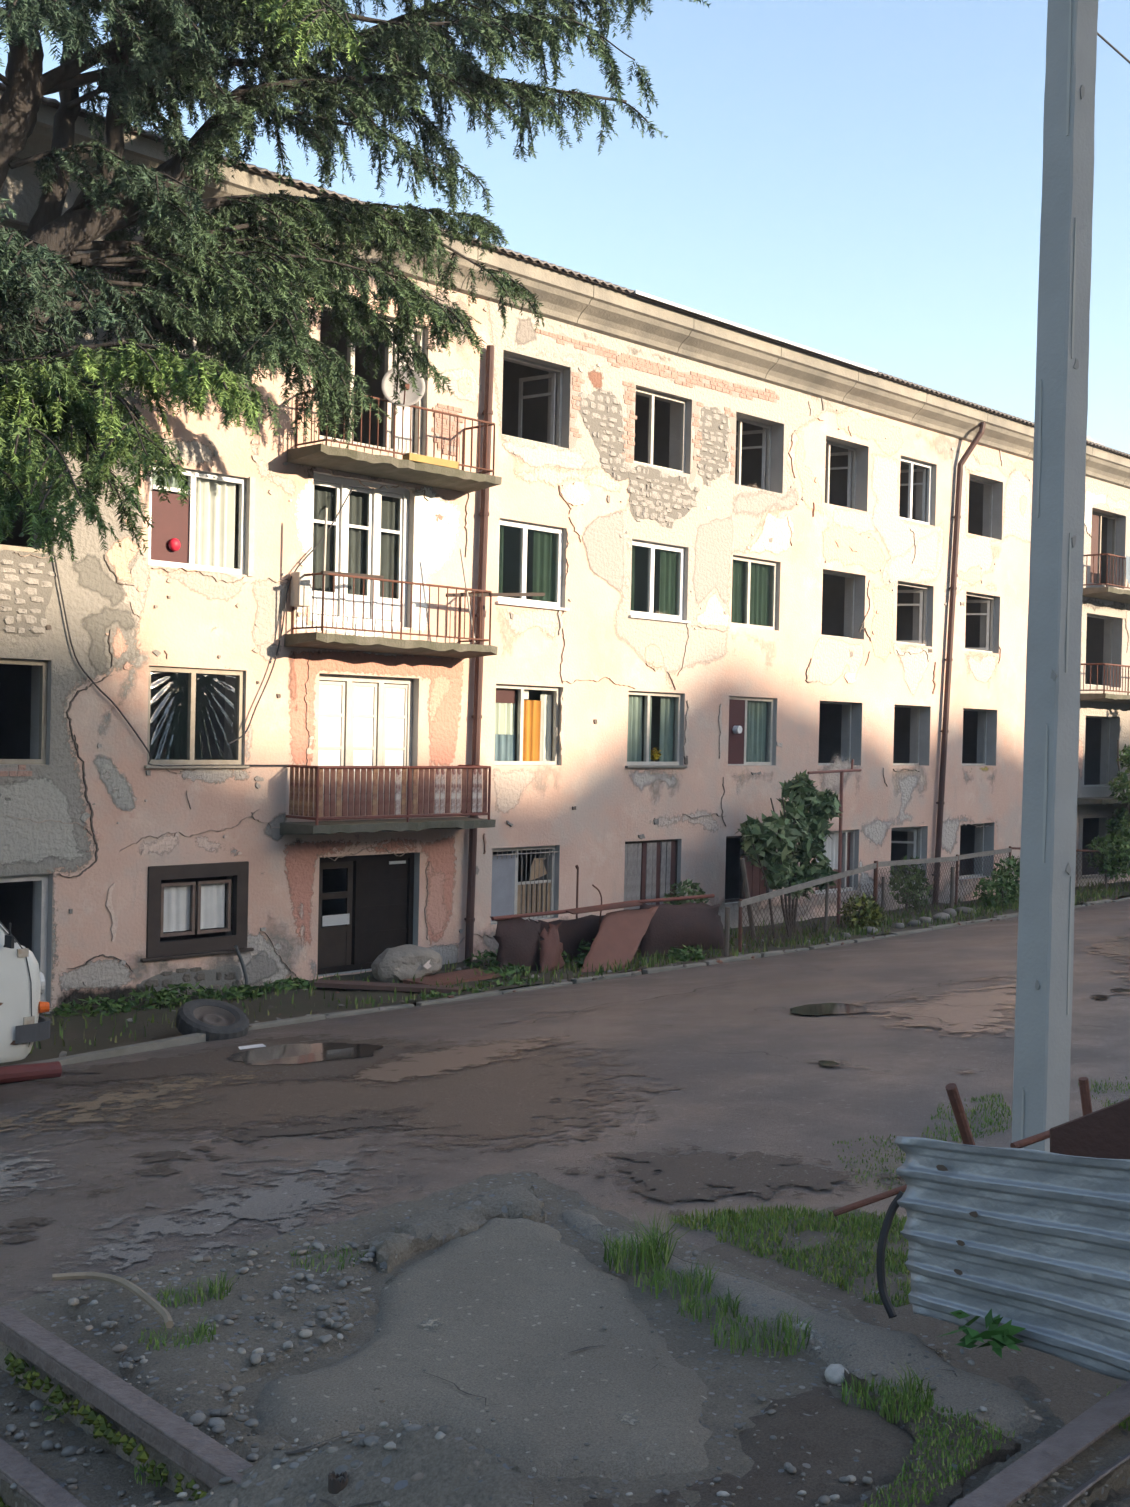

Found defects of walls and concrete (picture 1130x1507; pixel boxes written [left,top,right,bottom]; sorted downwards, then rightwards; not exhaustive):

spalling [0,161,43,224]
spalling [61,179,85,216]
spalling [64,273,153,358]
spalling [432,300,1033,695]
spalling [0,432,463,1009]